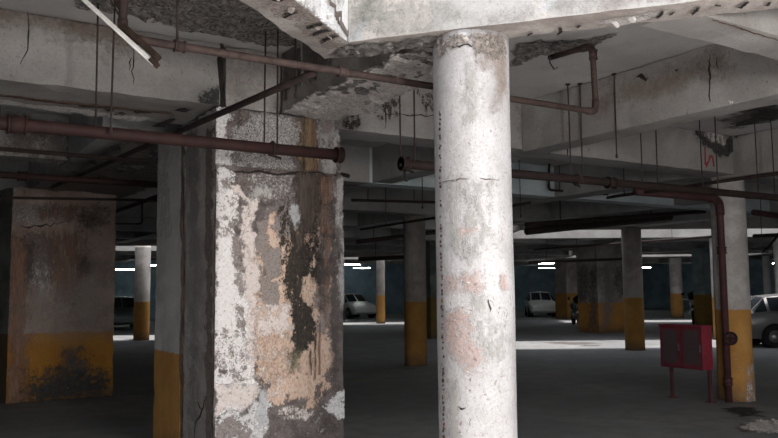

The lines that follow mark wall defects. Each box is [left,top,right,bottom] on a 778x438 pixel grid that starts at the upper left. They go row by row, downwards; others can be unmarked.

crack [20,12,29,64]
spalling [74,0,118,14]
spalling [128,0,675,149]
crack [708,54,719,102]
water stain [707,105,778,148]
peeling [203,149,345,438]
water stain [228,169,331,367]
crack [379,102,496,438]
peeling [442,243,514,378]